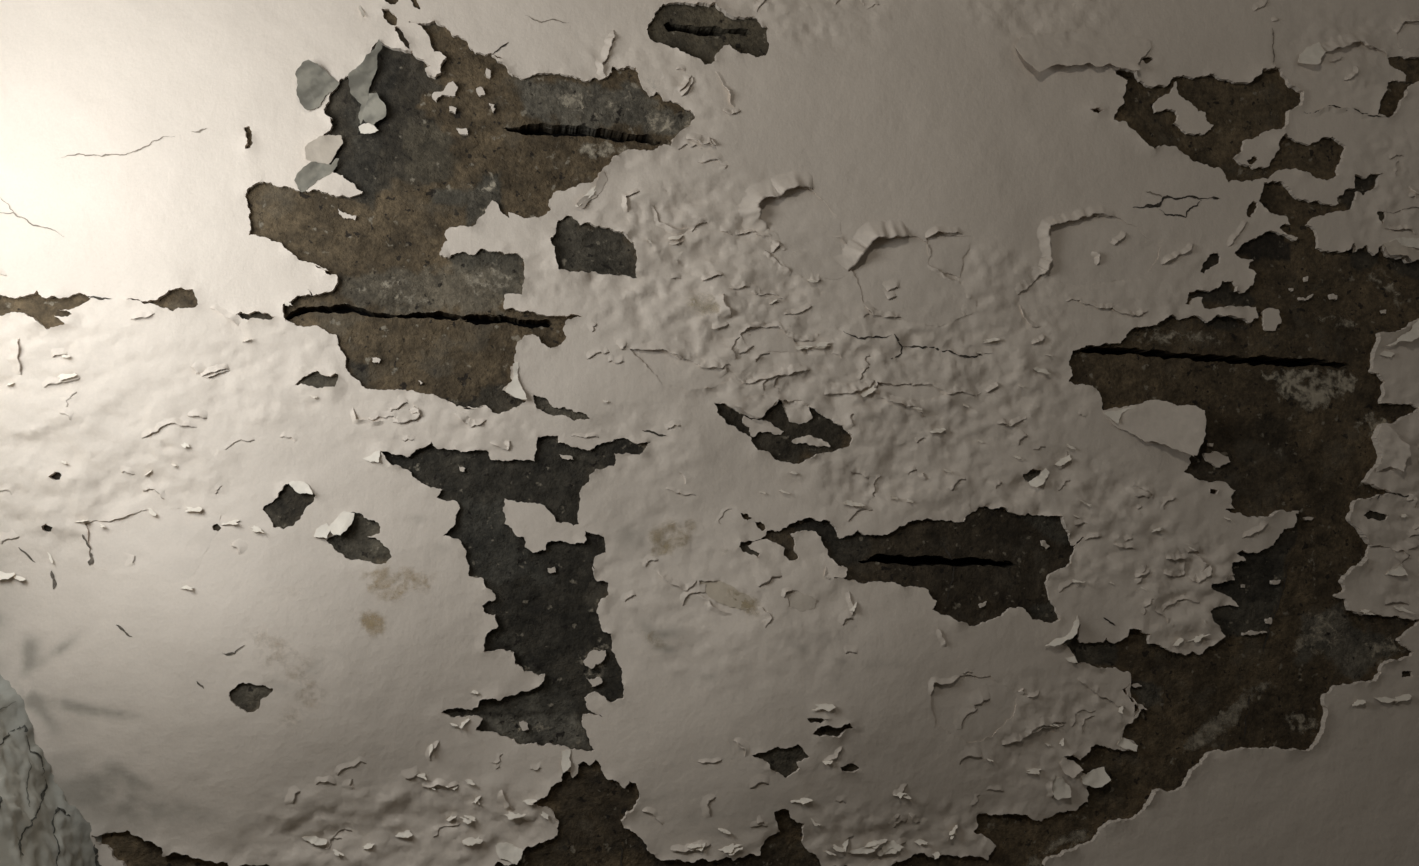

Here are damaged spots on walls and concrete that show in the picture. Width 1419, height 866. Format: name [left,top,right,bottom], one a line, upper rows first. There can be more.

spalling [245,0,769,427]
peeling [0,293,90,329]
peeling [131,289,273,326]
crack [299,308,550,329]
crack [1080,350,1328,367]
spalling [363,14,1419,866]
crack [18,547,57,589]
crack [82,534,93,565]
peeling [314,511,391,564]
crack [857,554,1006,566]
crack [0,701,102,866]
spalling [101,830,269,866]